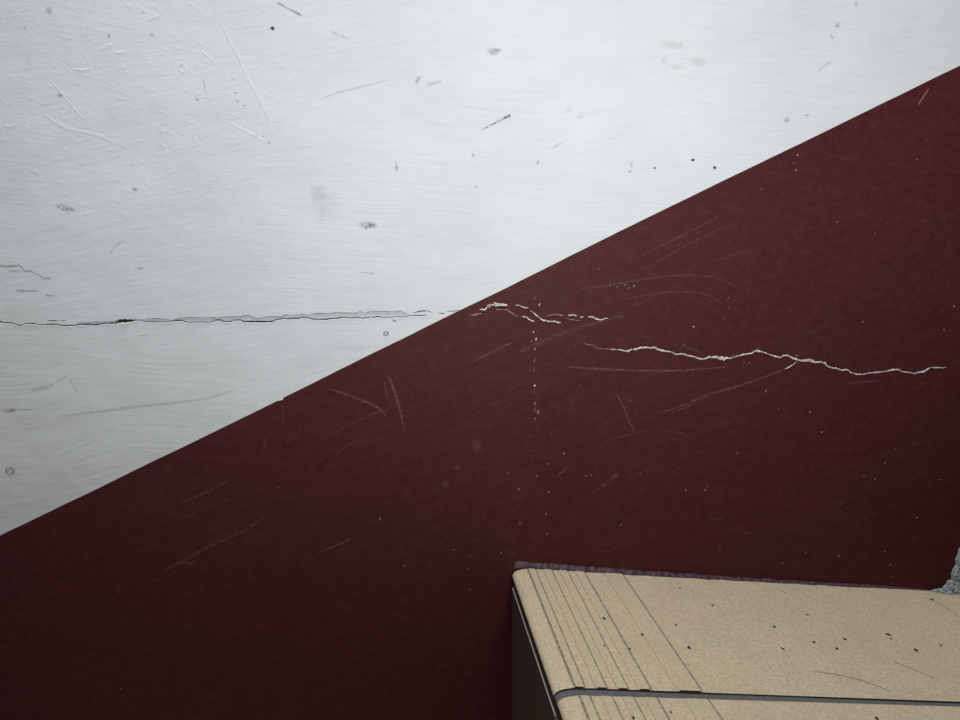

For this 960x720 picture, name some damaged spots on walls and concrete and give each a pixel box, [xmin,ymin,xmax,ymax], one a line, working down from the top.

crack [0,298,607,420]
crack [584,343,945,375]